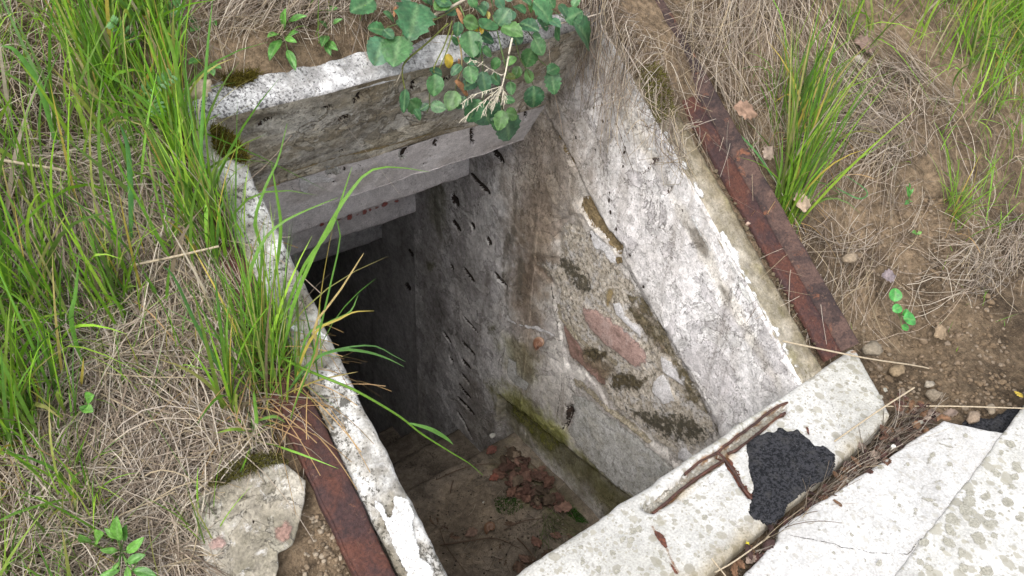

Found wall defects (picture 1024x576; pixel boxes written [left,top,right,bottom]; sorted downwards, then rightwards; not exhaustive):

flaking render [537,222,797,514]
peeling [374,496,434,576]